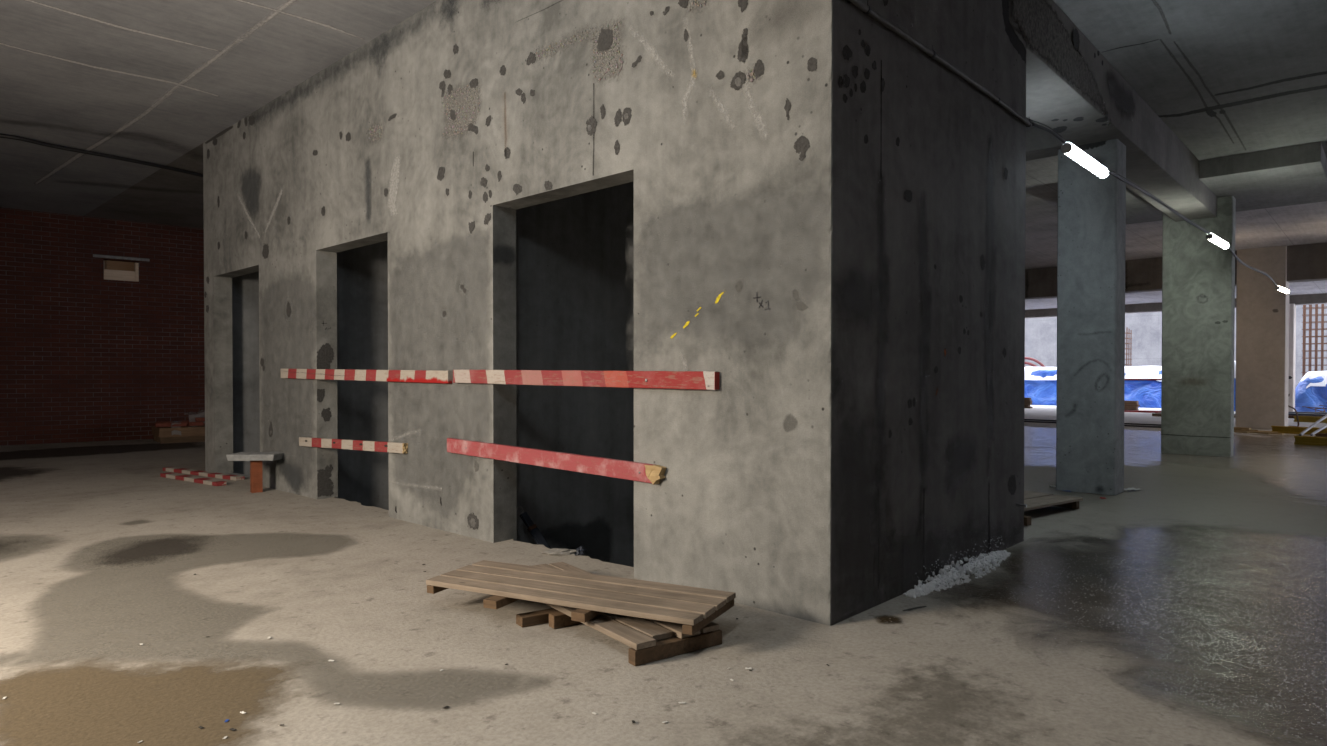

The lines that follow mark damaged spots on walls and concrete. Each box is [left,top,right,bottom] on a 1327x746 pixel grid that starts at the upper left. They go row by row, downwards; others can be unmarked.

water stain [834,137,1020,613]
water stain [0,520,543,746]